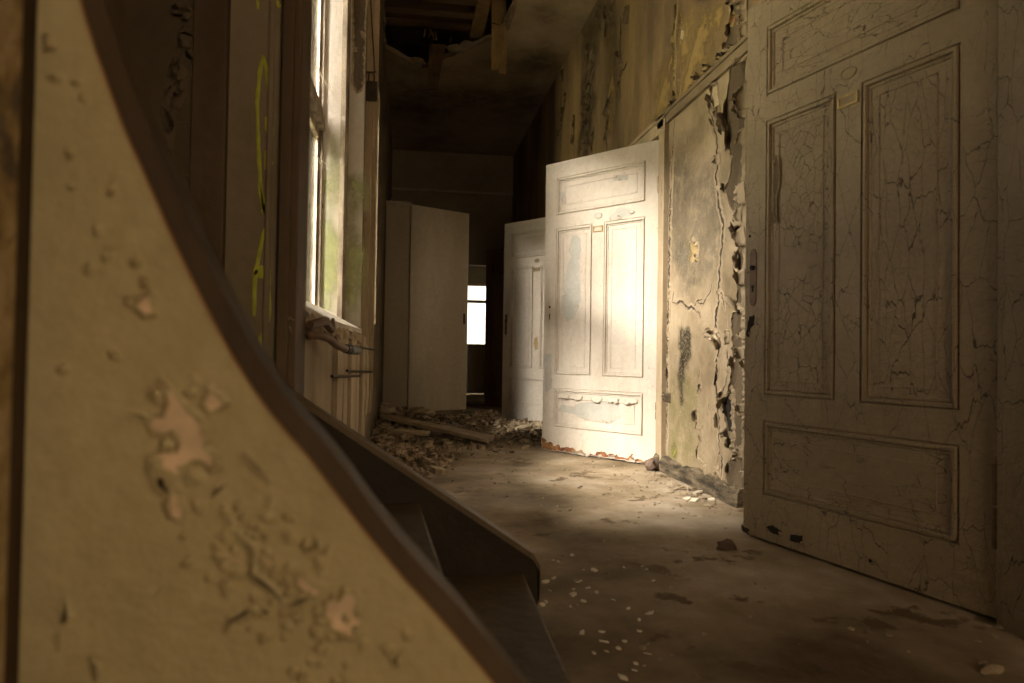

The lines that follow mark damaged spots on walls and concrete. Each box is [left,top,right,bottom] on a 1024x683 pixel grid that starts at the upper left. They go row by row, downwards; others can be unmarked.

crack [664,0,730,480]
peeling [689,0,756,489]
leakage [678,328,691,405]
peeling [143,371,227,529]
peeling [320,584,367,643]